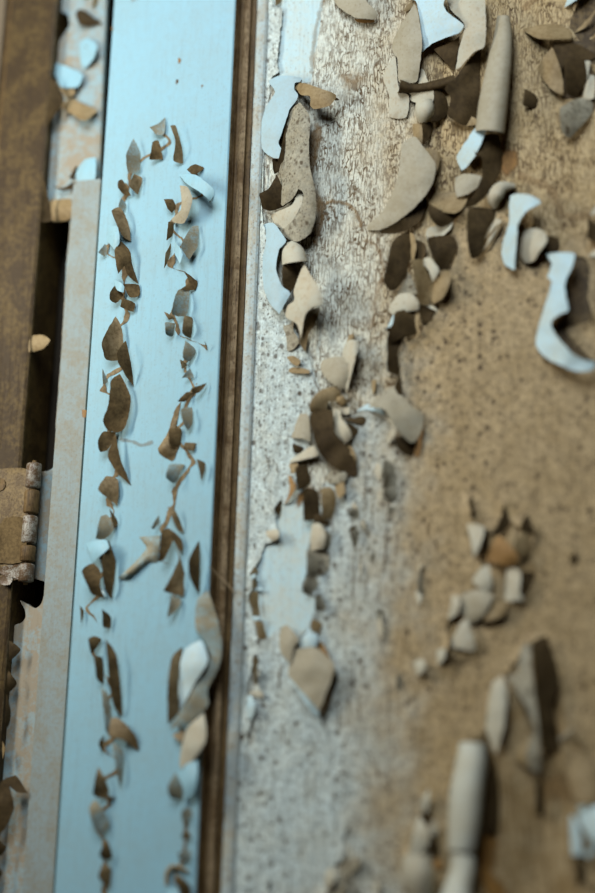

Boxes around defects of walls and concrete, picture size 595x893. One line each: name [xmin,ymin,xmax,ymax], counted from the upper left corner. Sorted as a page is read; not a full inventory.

peeling [40,0,114,222]
peeling [28,335,50,352]
peeling [249,0,595,717]
peeling [80,118,222,893]
peeling [5,641,21,730]
peeling [246,654,264,747]
peeling [403,636,595,893]
peeling [0,775,28,856]
peeling [325,826,361,893]